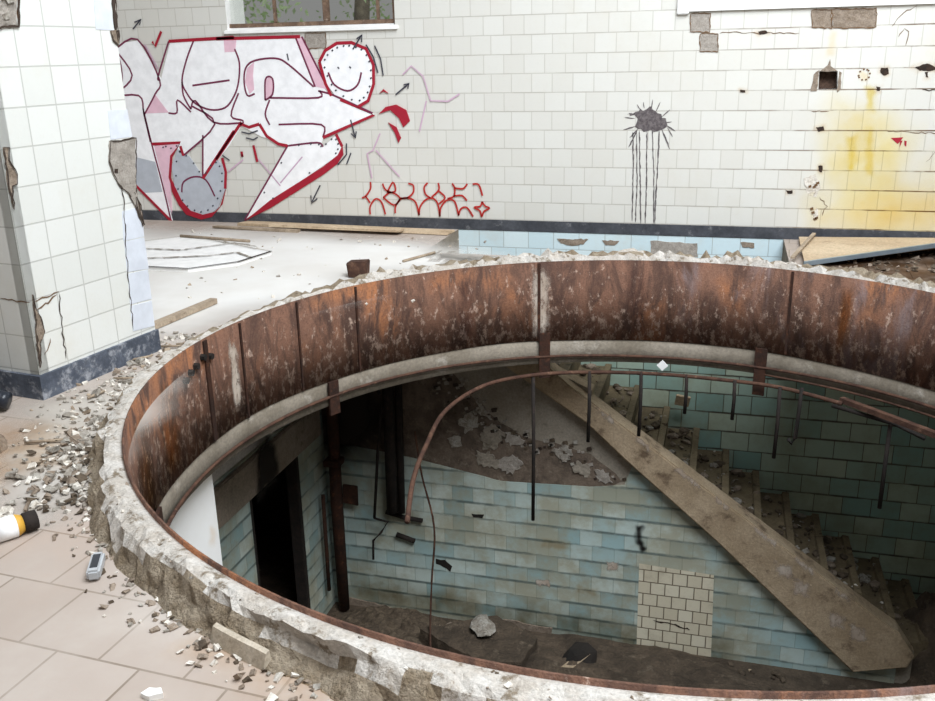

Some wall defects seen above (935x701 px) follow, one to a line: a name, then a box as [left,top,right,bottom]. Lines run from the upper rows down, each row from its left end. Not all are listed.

spalling [0,0,20,29]
peeling [690,12,719,52]
peeling [811,7,877,29]
spalling [811,61,842,92]
peeling [3,147,18,210]
spalling [108,137,145,226]
peeling [650,240,698,257]
peeling [32,294,45,367]
corrosion [229,344,240,403]
spalling [212,366,914,691]